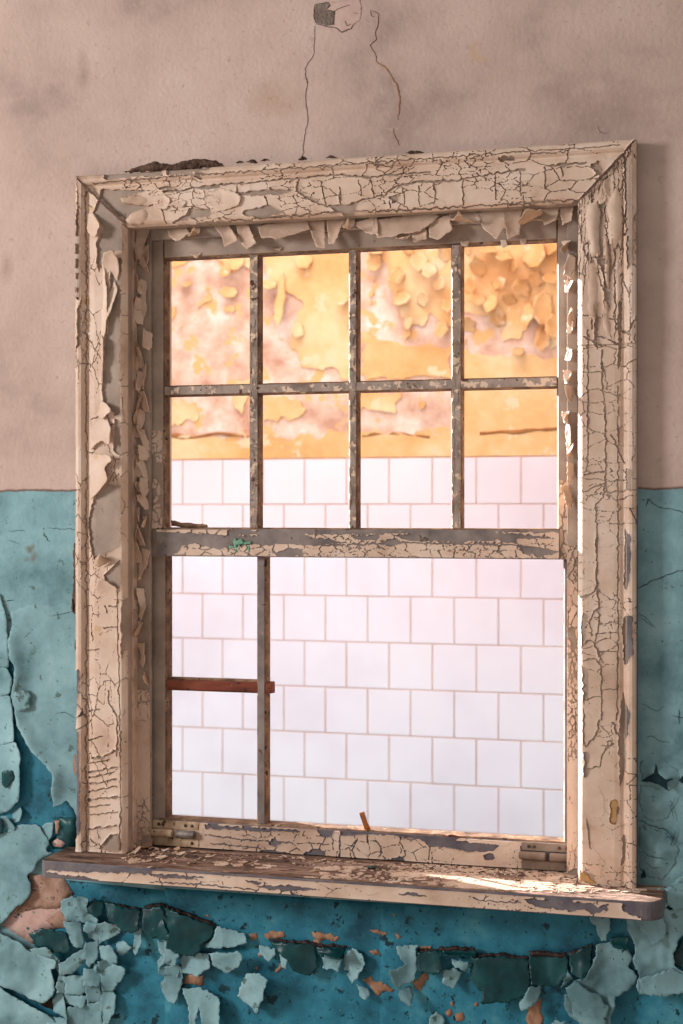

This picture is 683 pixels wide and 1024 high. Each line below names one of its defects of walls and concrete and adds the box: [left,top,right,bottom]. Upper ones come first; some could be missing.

crack [301,29,315,159]
flaking render [313,0,362,32]
crack [370,10,401,145]
peeling [72,139,647,893]
peeling [0,595,683,1024]